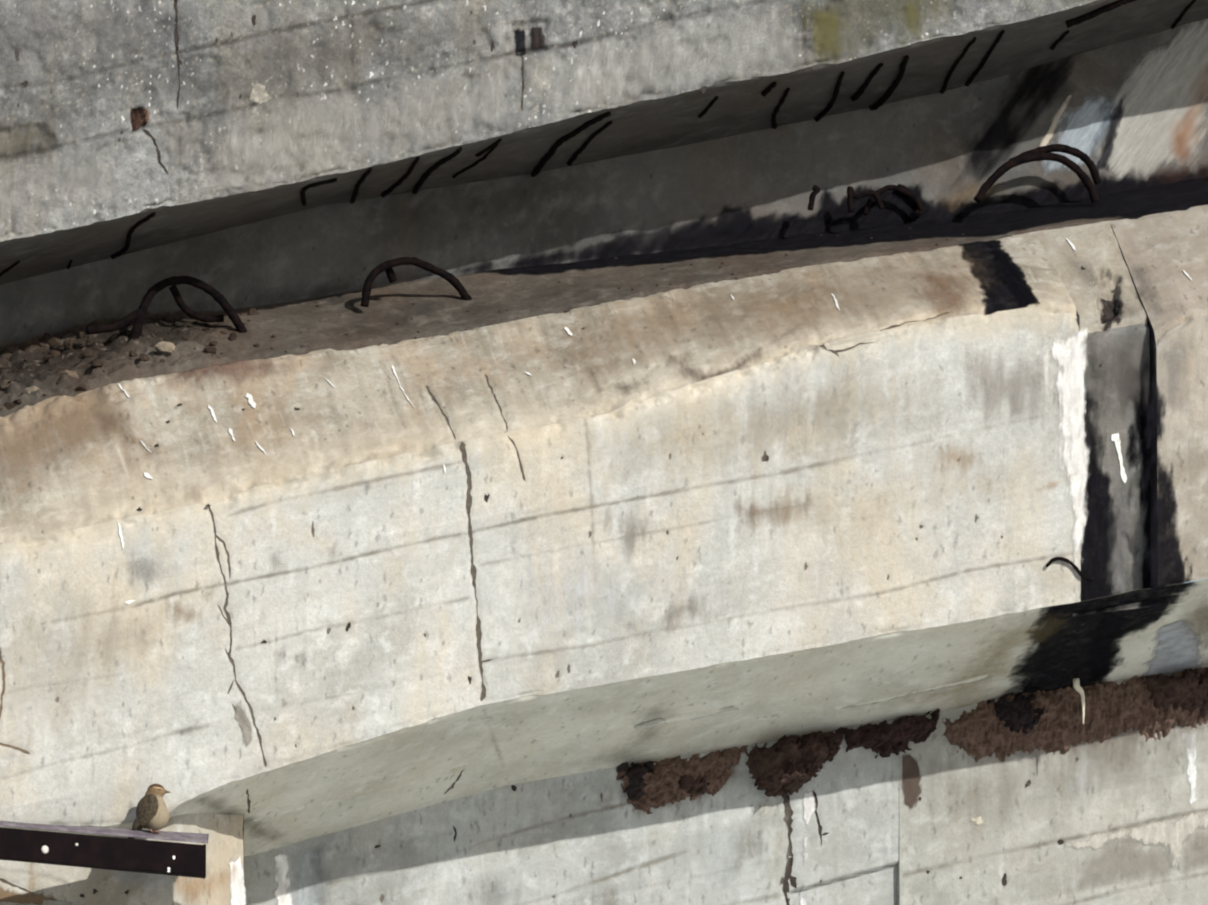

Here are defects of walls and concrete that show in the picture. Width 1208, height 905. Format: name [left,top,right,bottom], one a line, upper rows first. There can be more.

corrosion [131,107,149,132]
damp [465,17,1208,315]
spalling [86,276,247,341]
crack [485,374,525,480]
crack [426,386,492,701]
damp [1004,329,1208,696]
crack [0,654,30,754]
crack [208,503,267,813]
crack [780,791,828,905]